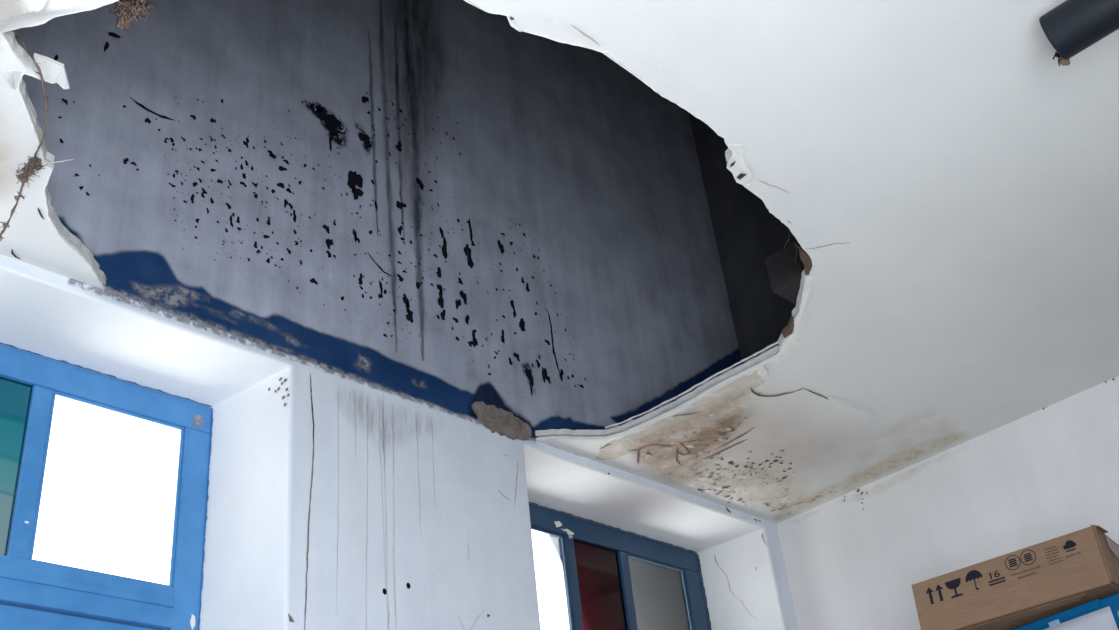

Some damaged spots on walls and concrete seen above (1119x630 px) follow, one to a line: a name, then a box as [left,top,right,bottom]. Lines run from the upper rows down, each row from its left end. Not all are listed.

spalling [2,0,118,290]
spalling [464,0,815,441]
crack [304,373,314,630]
damp [628,378,819,522]